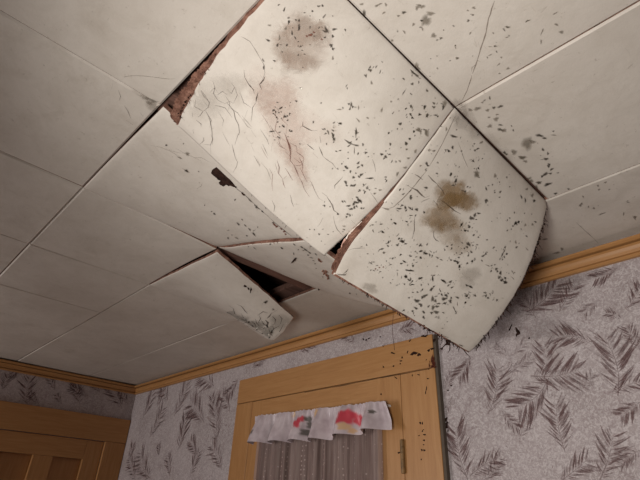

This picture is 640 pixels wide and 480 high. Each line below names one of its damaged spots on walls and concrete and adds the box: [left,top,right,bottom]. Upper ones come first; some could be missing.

crack [195,39,265,172]
spalling [211,167,263,212]
leakage [332,130,380,218]
leakage [390,173,521,318]